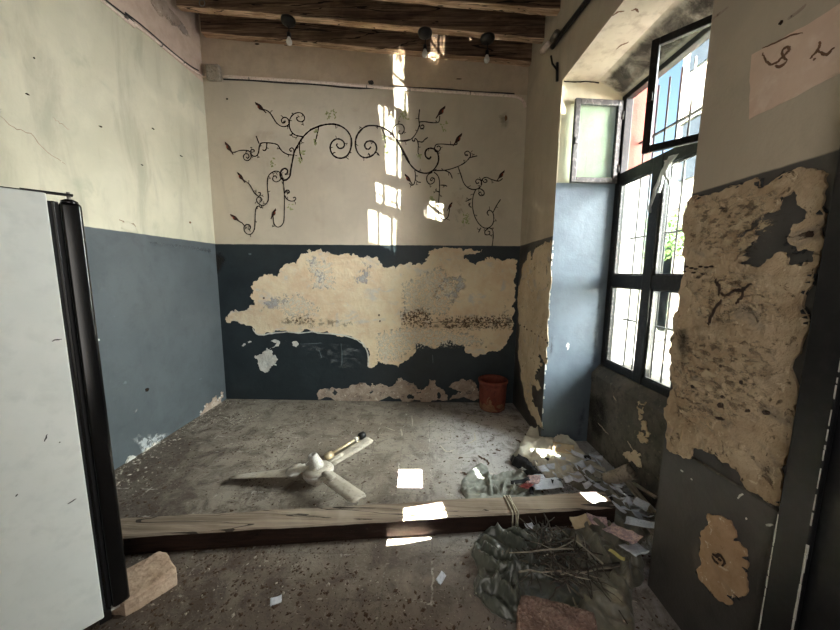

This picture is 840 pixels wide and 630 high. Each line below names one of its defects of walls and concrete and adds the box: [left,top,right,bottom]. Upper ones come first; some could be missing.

peeling [225,240,554,430]
peeling [664,167,829,506]
spalling [200,391,223,416]
peeling [621,401,651,470]
spalling [695,513,750,607]